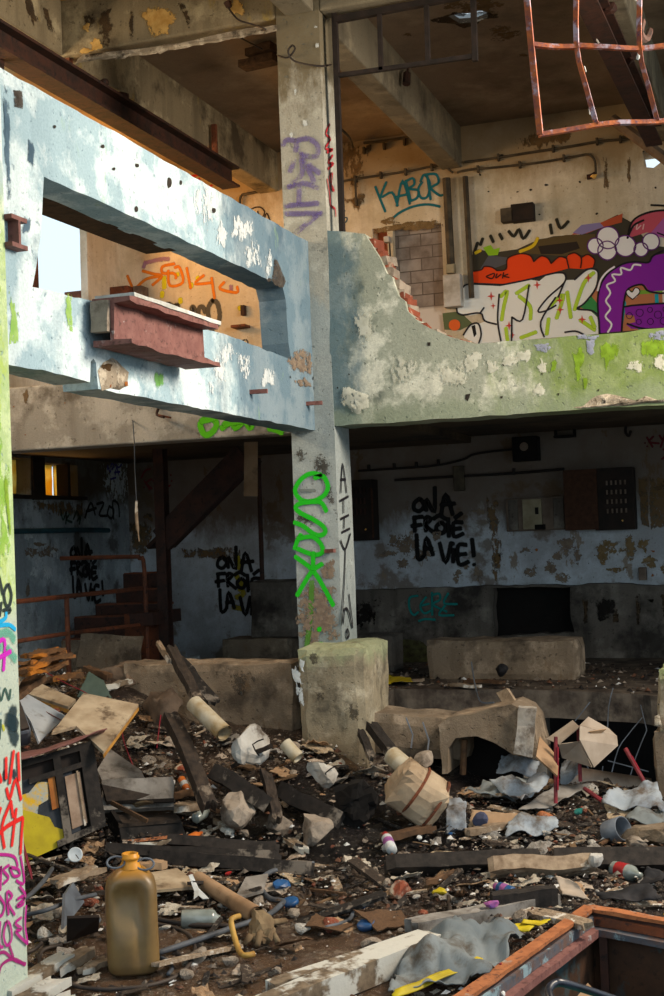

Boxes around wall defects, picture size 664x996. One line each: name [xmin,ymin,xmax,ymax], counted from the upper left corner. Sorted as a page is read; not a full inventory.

peeling [369,217,551,396]
peeling [354,308,372,344]
peeling [577,335,599,355]
peeling [654,354,664,371]